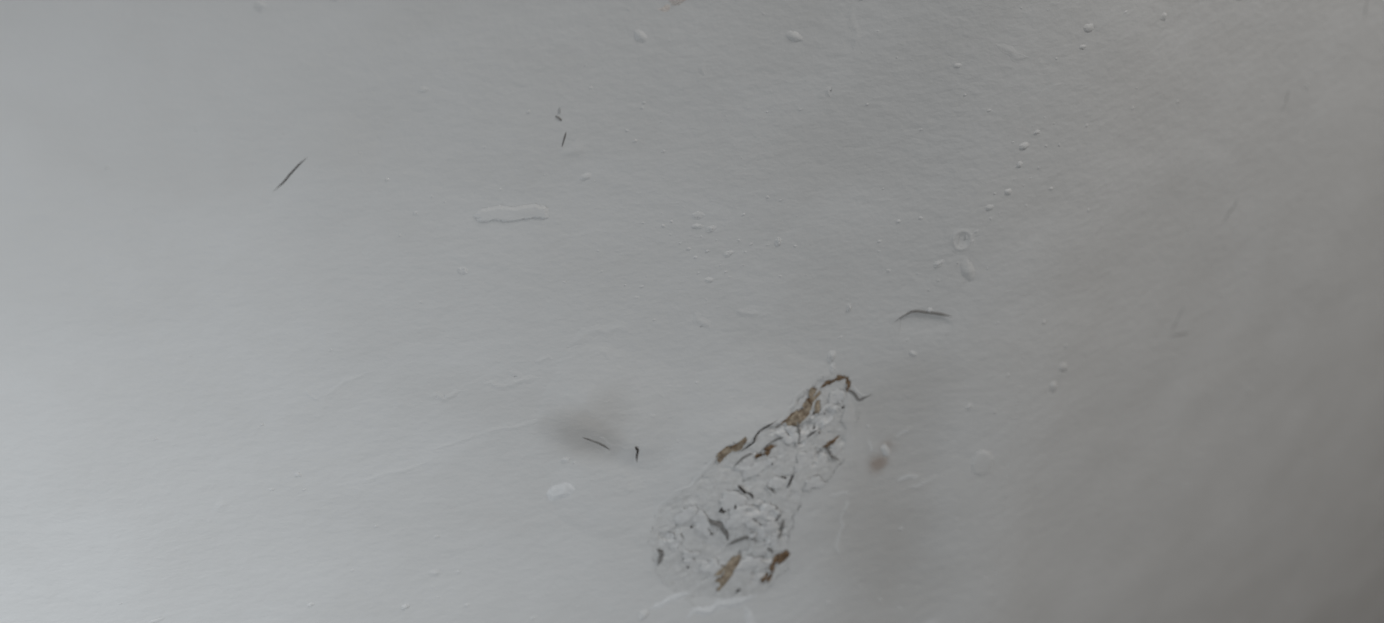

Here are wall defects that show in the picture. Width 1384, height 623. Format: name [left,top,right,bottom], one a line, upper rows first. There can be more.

flaking render [648,372,864,607]